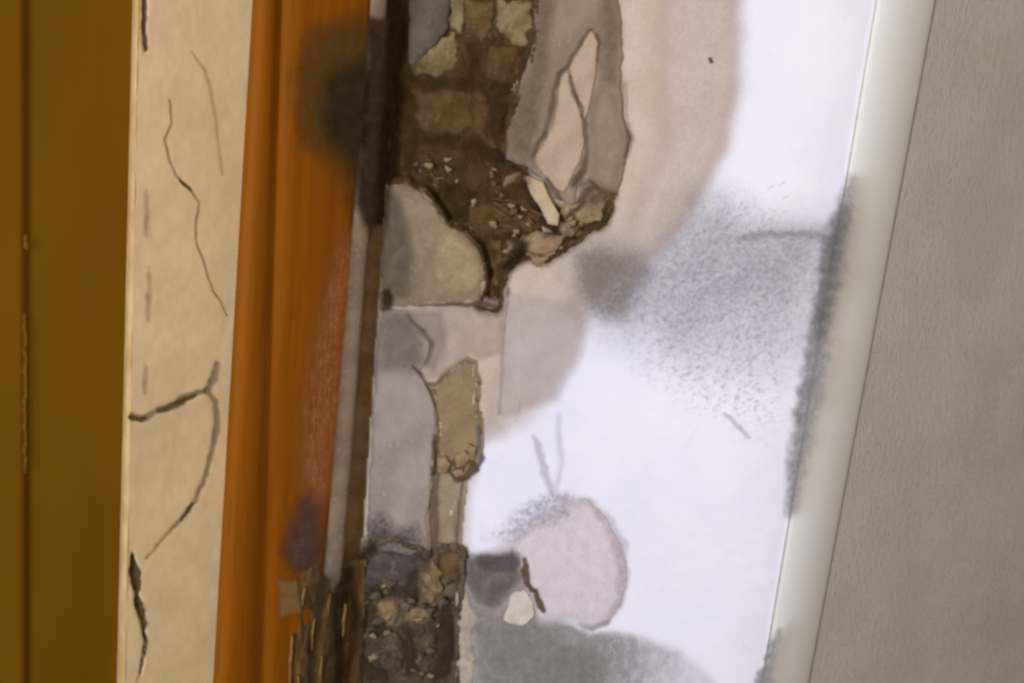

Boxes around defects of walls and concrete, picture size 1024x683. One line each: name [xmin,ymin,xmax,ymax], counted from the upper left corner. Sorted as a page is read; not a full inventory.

crack [164,100,227,316]
water stain [299,0,443,228]
hole [379,290,392,310]
flaking render [386,0,631,414]
water stain [372,0,854,513]
crack [128,362,219,558]
flaking render [424,356,484,483]
flaking render [359,536,467,683]
water stain [465,552,645,683]